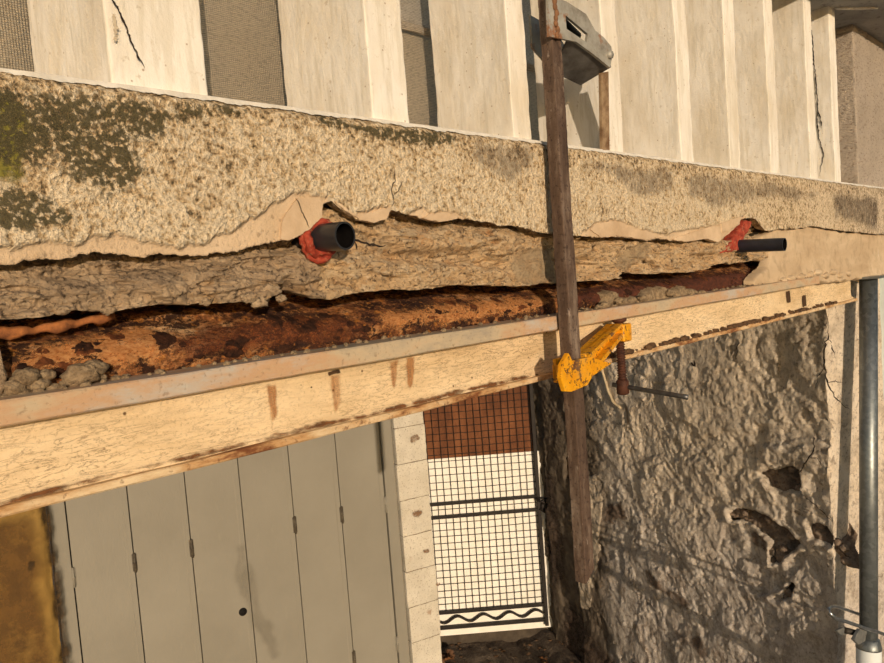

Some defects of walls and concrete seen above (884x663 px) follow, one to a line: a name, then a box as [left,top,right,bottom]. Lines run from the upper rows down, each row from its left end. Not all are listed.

crack [112,0,145,68]
crack [811,30,824,176]
spalling [0,197,556,319]
rust [380,295,550,327]
rust [577,270,752,305]
spalling [573,216,768,282]
rust [14,313,371,378]
rust [392,358,414,387]
crack [815,314,847,408]
spalling [762,466,801,491]
spalling [730,508,801,563]
leakage [0,506,69,663]